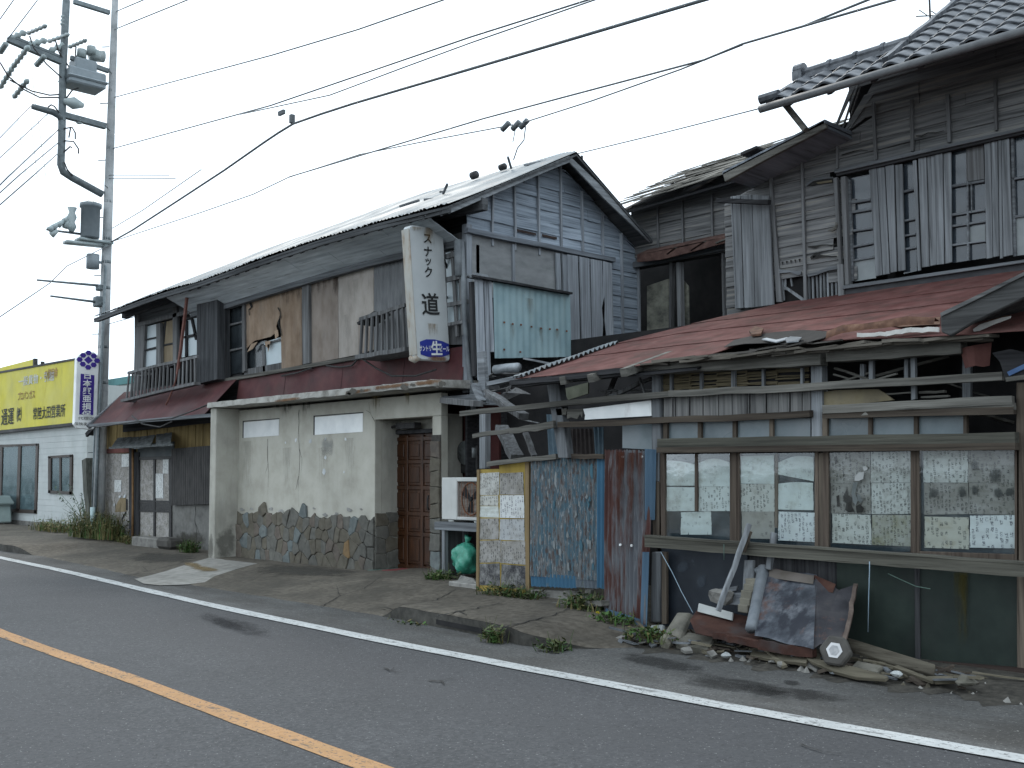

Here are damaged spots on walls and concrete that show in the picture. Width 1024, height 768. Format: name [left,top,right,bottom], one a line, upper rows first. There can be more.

corrosion [826,316,940,339]
corrosion [973,316,1011,332]
corrosion [616,452,643,541]